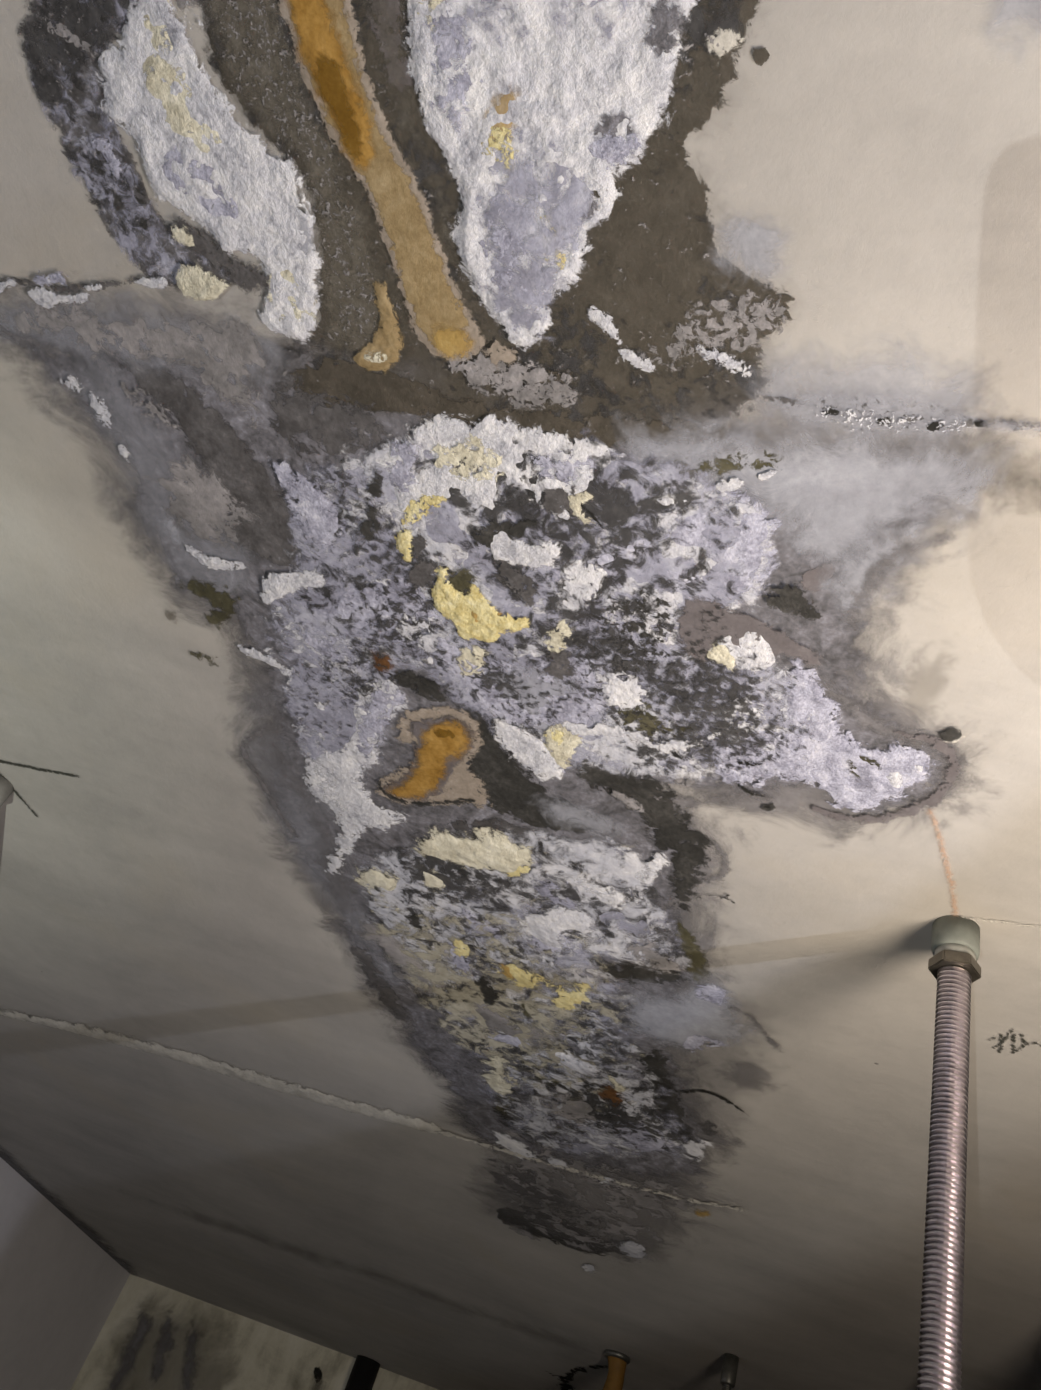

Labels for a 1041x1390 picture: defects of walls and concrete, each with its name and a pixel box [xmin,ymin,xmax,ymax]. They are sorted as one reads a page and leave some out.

leakage [752,48,770,66]
rust [278,0,485,361]
crack [0,269,177,309]
leakage [836,399,867,426]
crack [758,396,1041,432]
rust [375,670,489,809]
spalling [939,728,965,743]
leakage [110,1313,197,1390]